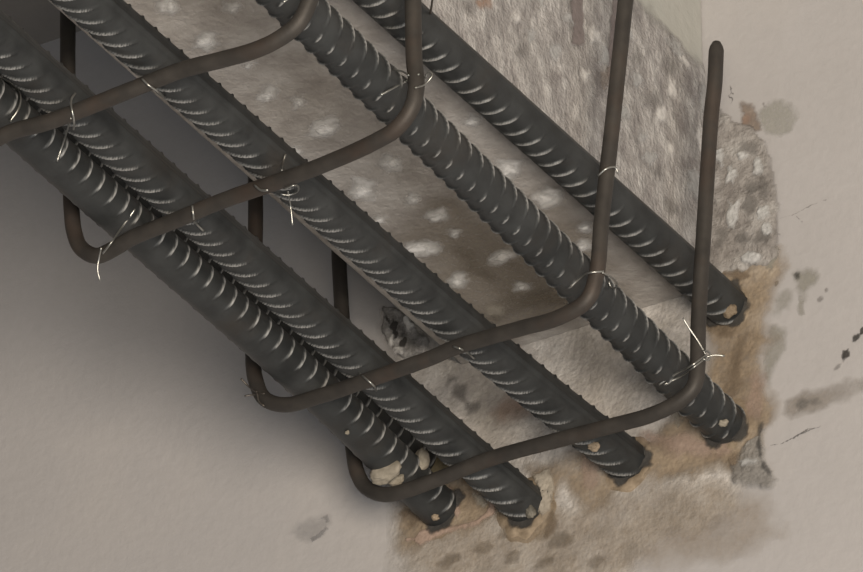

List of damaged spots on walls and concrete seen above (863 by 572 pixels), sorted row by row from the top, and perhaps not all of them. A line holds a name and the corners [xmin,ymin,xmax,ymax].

spalling [421,0,613,162]
spalling [615,0,706,248]
spalling [710,111,779,273]
spalling [382,307,440,362]
spalling [411,357,555,449]
spalling [520,325,667,418]
spalling [625,412,679,442]
spalling [641,296,691,358]
leakage [787,391,835,414]
spalling [392,423,774,572]